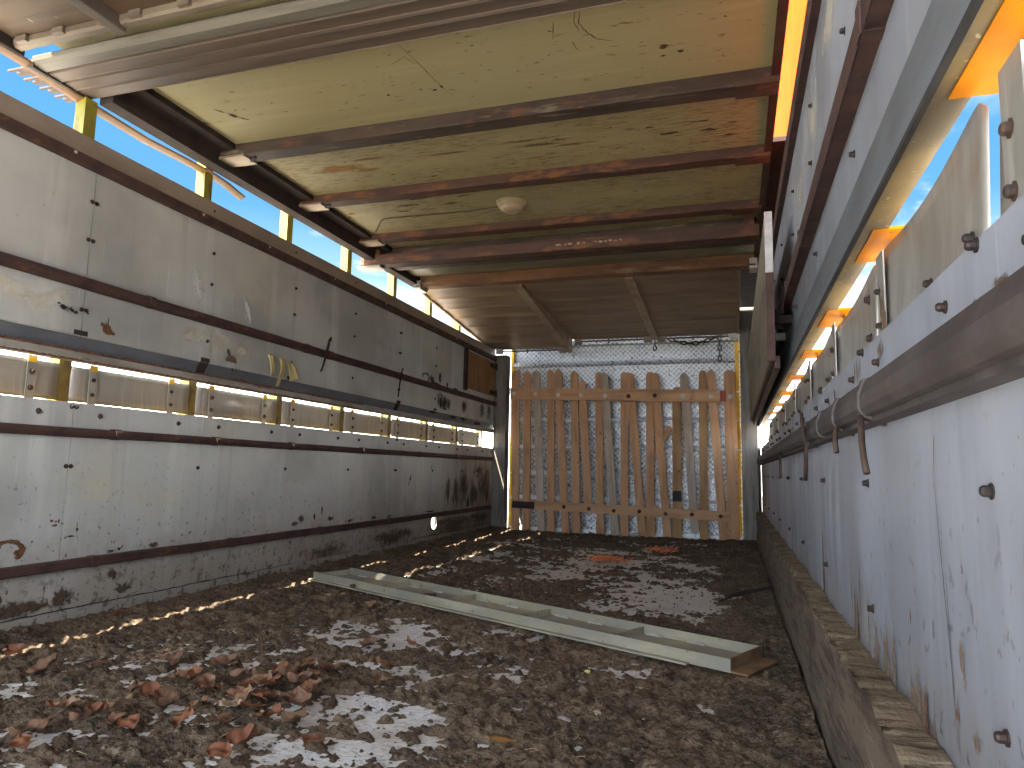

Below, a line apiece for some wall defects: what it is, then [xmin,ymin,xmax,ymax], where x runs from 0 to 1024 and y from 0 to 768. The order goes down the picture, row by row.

damp [426,468,488,532]
rust [0,539,26,559]